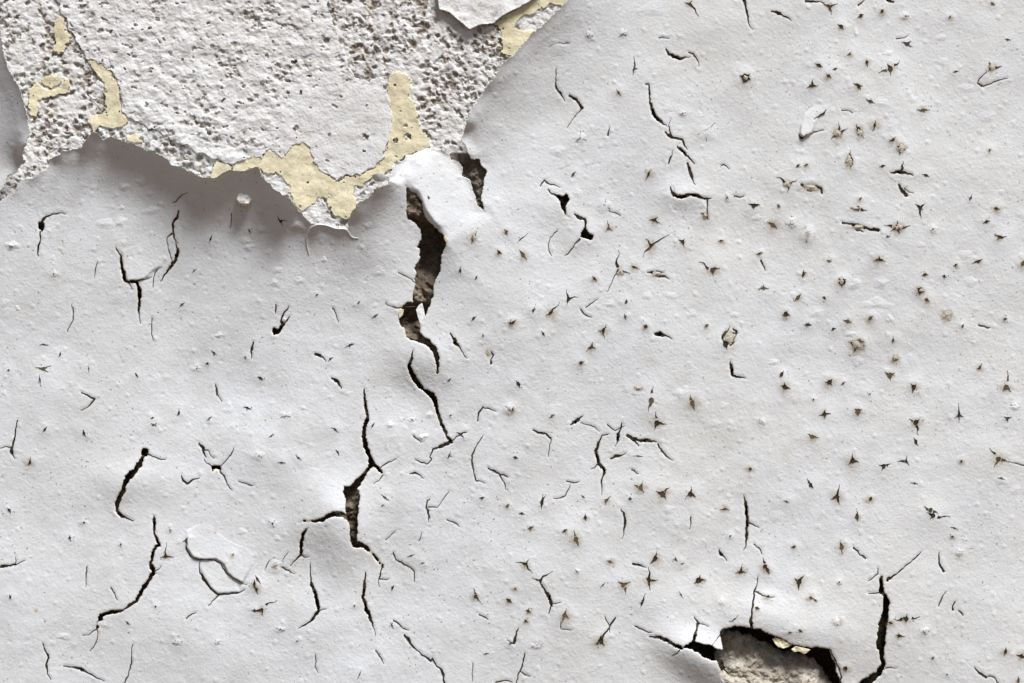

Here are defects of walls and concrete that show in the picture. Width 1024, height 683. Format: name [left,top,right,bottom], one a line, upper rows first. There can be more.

peeling [0,0,567,229]
crack [617,29,823,242]
crack [42,152,718,683]
crack [807,338,964,683]
spalling [649,577,842,683]